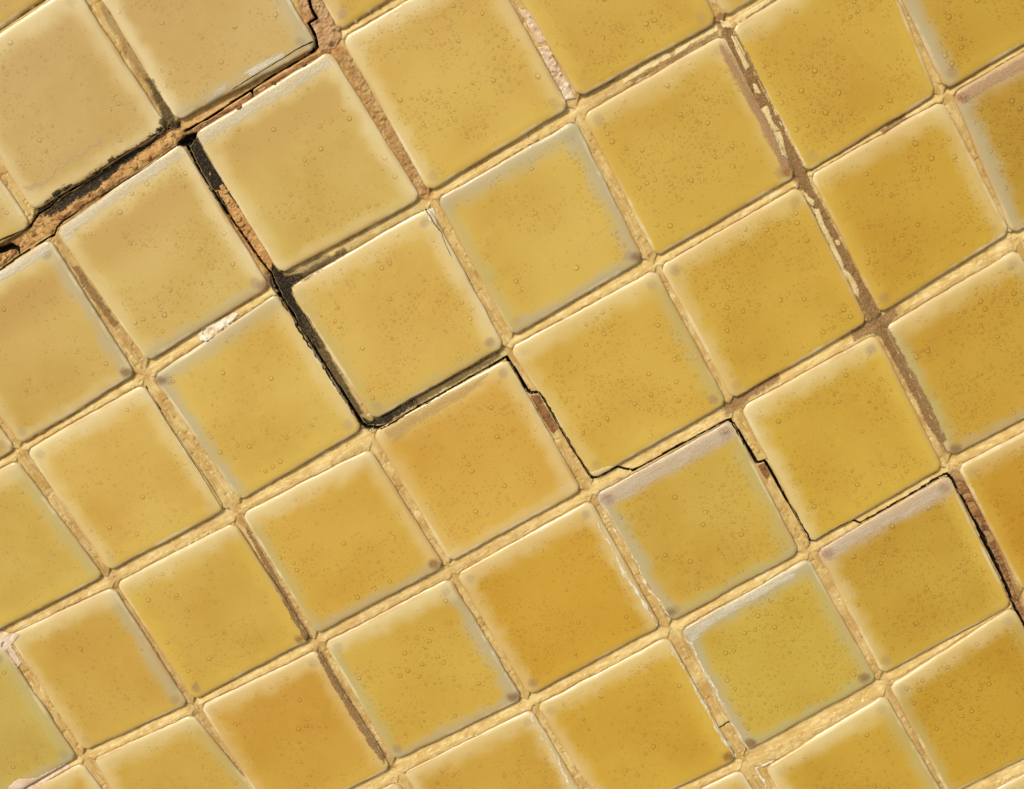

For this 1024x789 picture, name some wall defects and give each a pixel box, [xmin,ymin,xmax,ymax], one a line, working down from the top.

crack [0,0,1024,627]